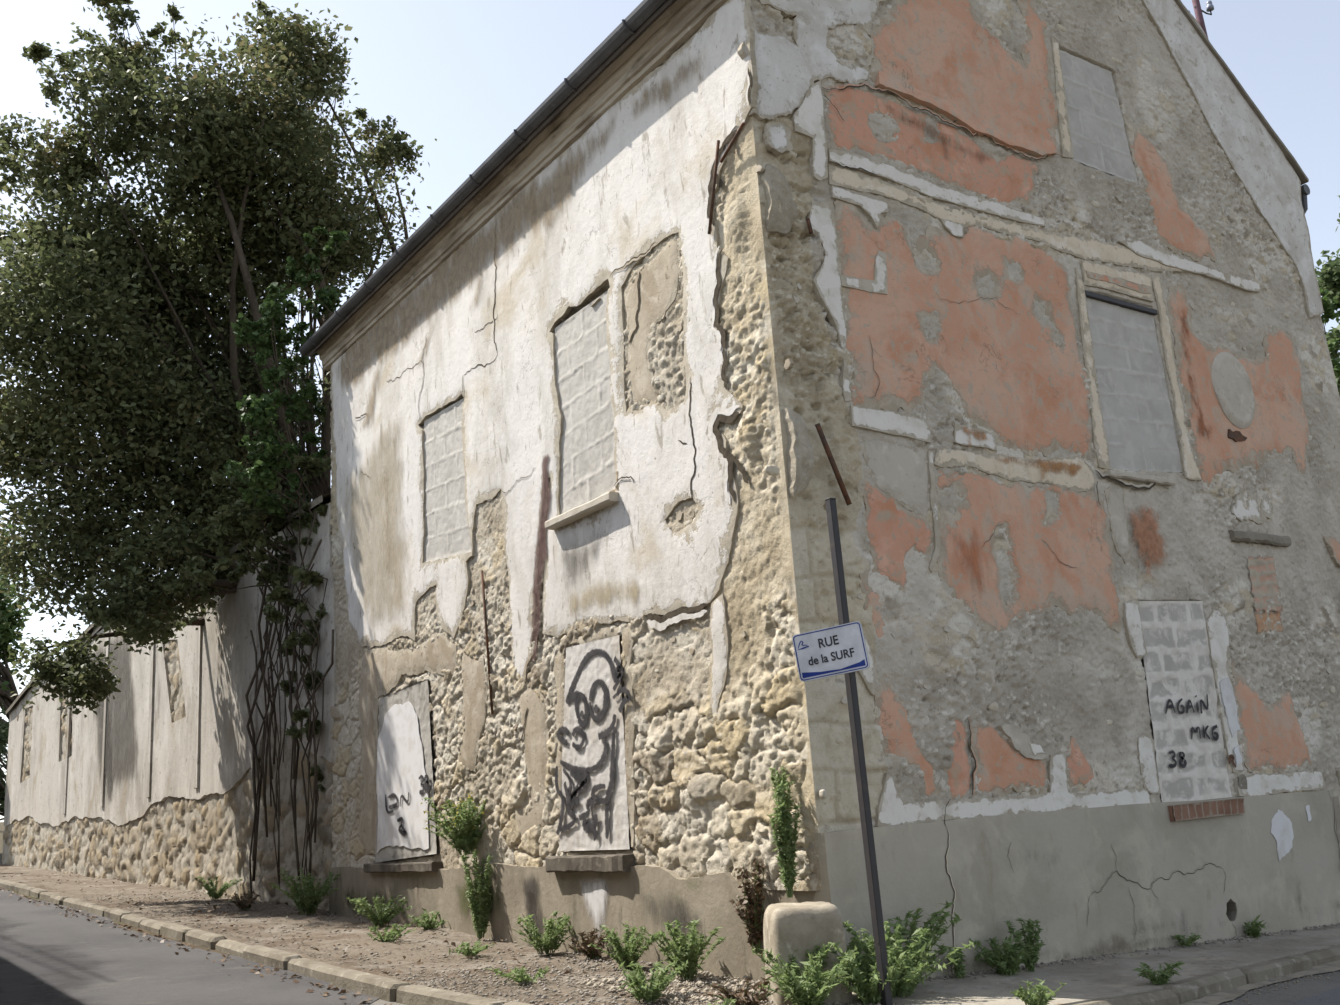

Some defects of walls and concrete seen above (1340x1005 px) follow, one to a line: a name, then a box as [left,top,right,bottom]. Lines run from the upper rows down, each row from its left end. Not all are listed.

leakage [91,640,137,798]
spalling [2,491,566,911]
corrosion [531,455,551,660]
crack [610,68,752,504]
spalling [622,110,1161,866]
crack [944,717,978,975]
crack [1087,848,1237,939]
spalling [1035,155,1340,790]